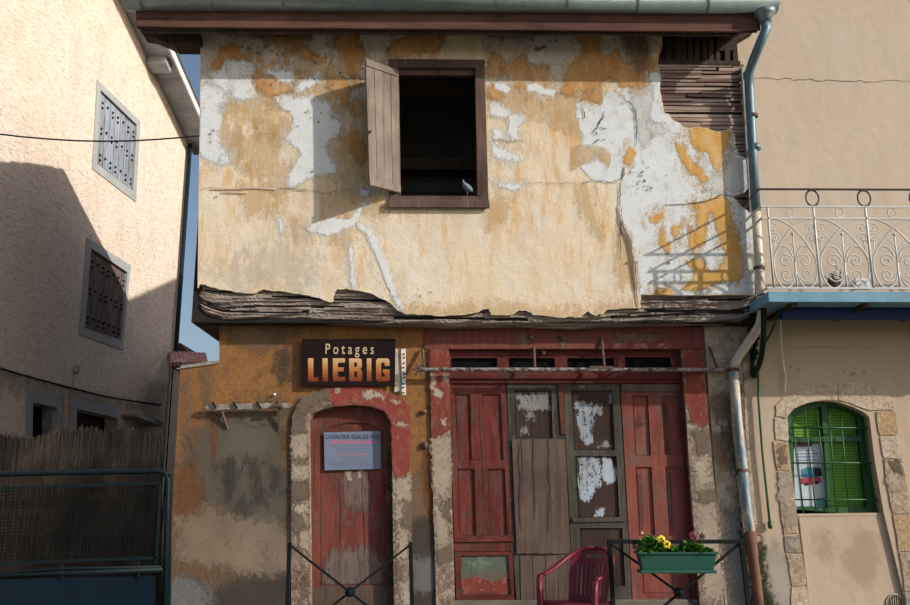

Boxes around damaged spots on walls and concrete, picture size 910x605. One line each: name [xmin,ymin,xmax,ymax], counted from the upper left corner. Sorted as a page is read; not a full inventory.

leakage [171,370,300,605]
leakage [219,326,299,385]
peeling [199,34,447,310]
peeling [290,386,413,605]
peeling [429,348,518,595]
crack [526,173,640,303]
peeling [482,35,754,296]
crack [756,75,900,83]